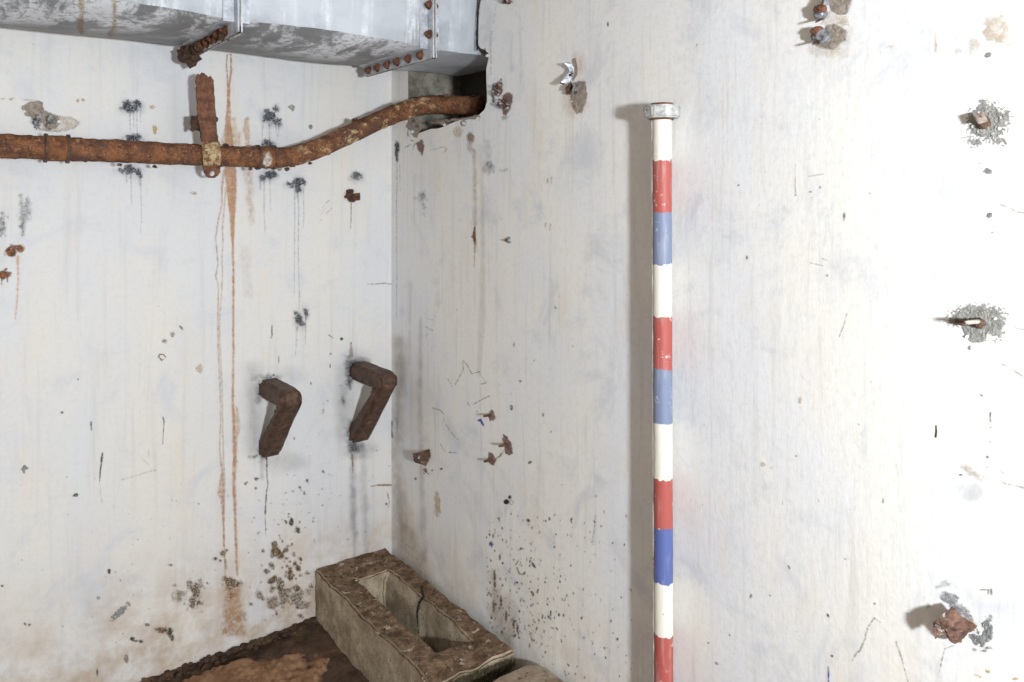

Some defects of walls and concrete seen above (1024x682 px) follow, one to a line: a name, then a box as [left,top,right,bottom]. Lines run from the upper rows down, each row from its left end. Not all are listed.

spalling [816,0,851,49]
spalling [22,101,76,131]
rust [222,58,257,148]
spalling [406,115,484,155]
spalling [964,100,1014,148]
rust [0,245,24,281]
rust [218,166,252,354]
spalling [946,302,1009,350]
rust [221,374,243,634]
spalling [941,592,993,652]